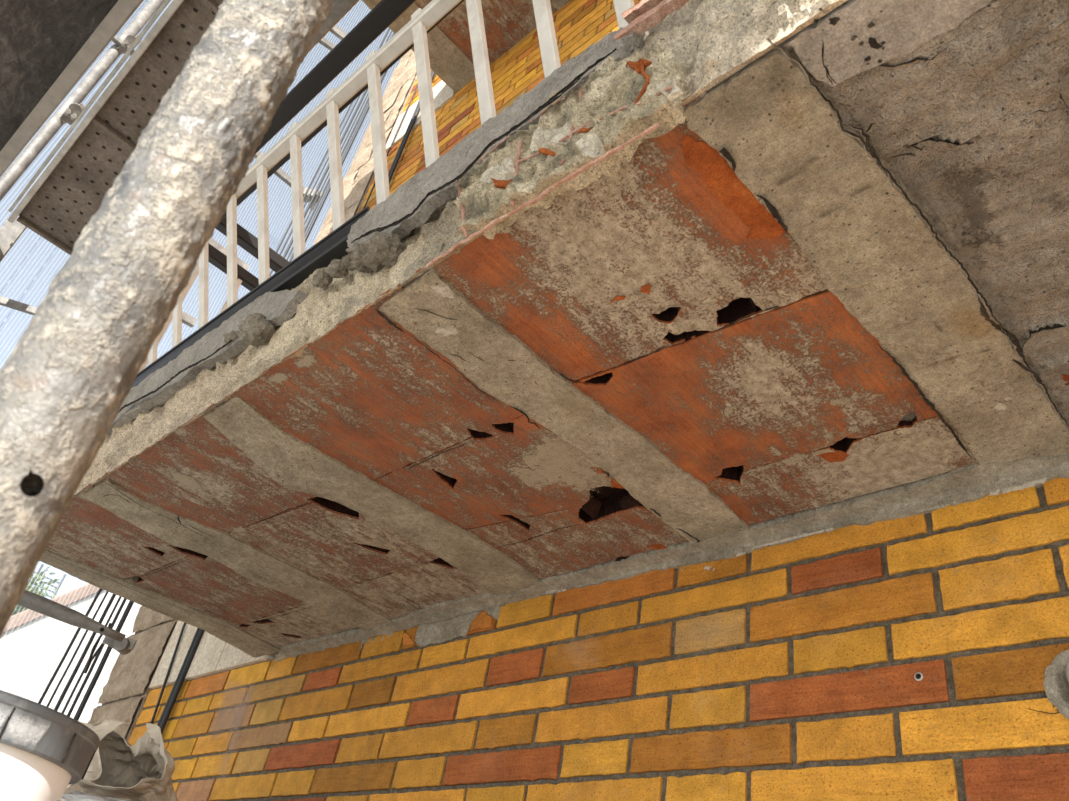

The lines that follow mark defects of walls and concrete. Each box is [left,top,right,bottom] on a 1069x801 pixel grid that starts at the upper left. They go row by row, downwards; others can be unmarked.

spalling [426,44,785,268]
crack [719,148,736,171]
crack [755,194,788,232]
crack [767,38,1069,430]
crack [119,338,234,412]
crack [876,343,973,461]
spalling [817,452,849,463]
peeling [581,497,602,521]
peeling [591,467,641,511]